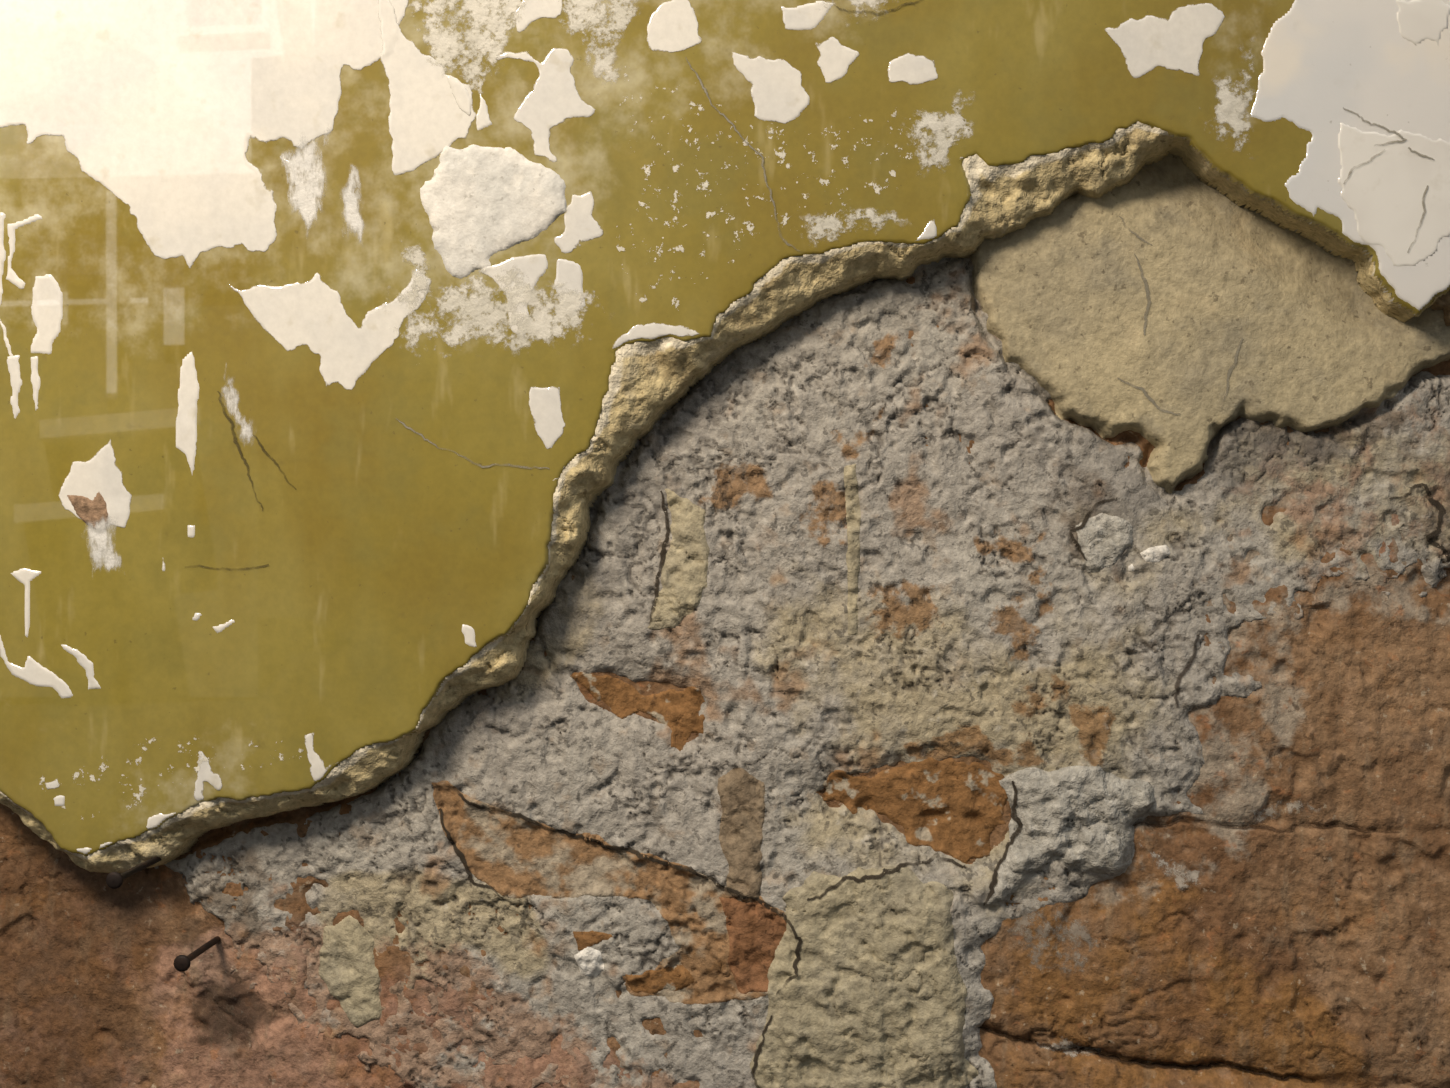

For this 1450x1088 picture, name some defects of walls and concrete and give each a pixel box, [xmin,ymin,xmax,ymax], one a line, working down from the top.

peeling [1250,0,1450,311]
peeling [479,192,603,337]
peeling [915,221,937,241]
peeling [0,212,63,419]
peeling [59,440,132,528]
peeling [10,568,41,638]
peeling [0,635,101,698]
spalling [164,257,1450,1088]
peeling [45,779,65,806]
crack [807,781,1023,906]
crack [751,1015,772,1088]
crack [978,1026,1313,1082]